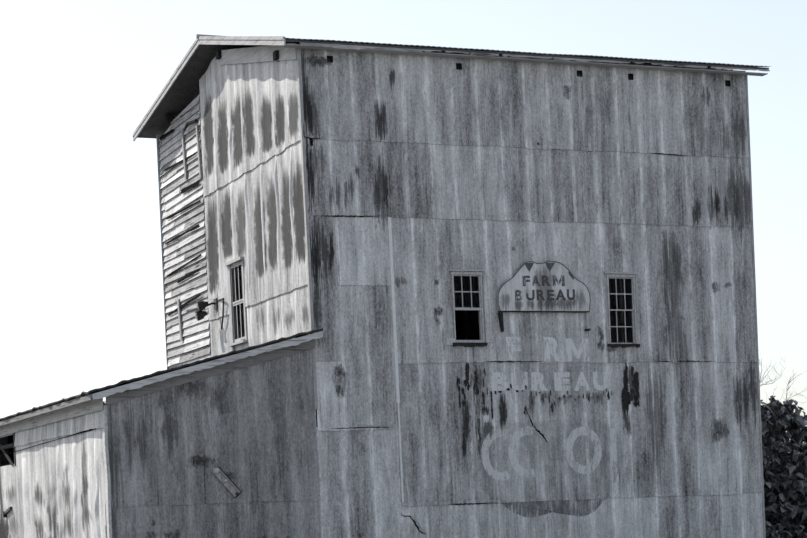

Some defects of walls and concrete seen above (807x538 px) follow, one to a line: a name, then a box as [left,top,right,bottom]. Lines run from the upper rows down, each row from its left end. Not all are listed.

rust [375,101,387,139]
rust [203,52,335,342]
rust [621,360,640,433]
crack [524,407,552,462]
crack [401,511,428,535]